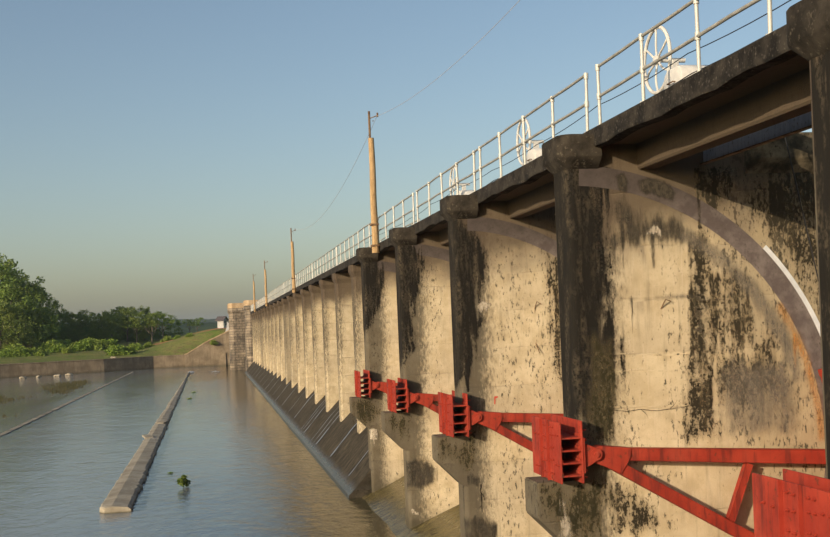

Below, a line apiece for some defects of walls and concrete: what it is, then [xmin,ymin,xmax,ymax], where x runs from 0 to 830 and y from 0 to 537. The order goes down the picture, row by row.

damp [546,256,562,381]
damp [604,165,819,445]